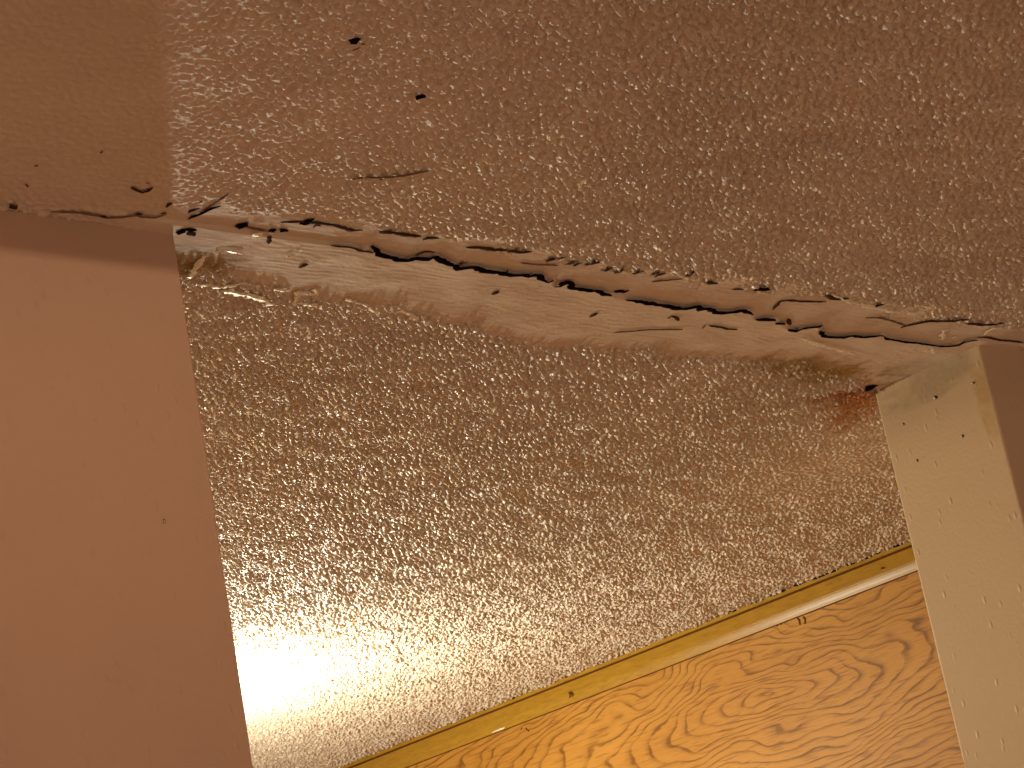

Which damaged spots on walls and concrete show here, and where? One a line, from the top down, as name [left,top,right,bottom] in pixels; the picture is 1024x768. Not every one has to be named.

crack [51,182,228,236]
spalling [235,222,274,237]
peeling [188,249,319,307]
peeling [345,298,379,313]
spalling [546,257,666,277]
crack [246,221,1023,347]